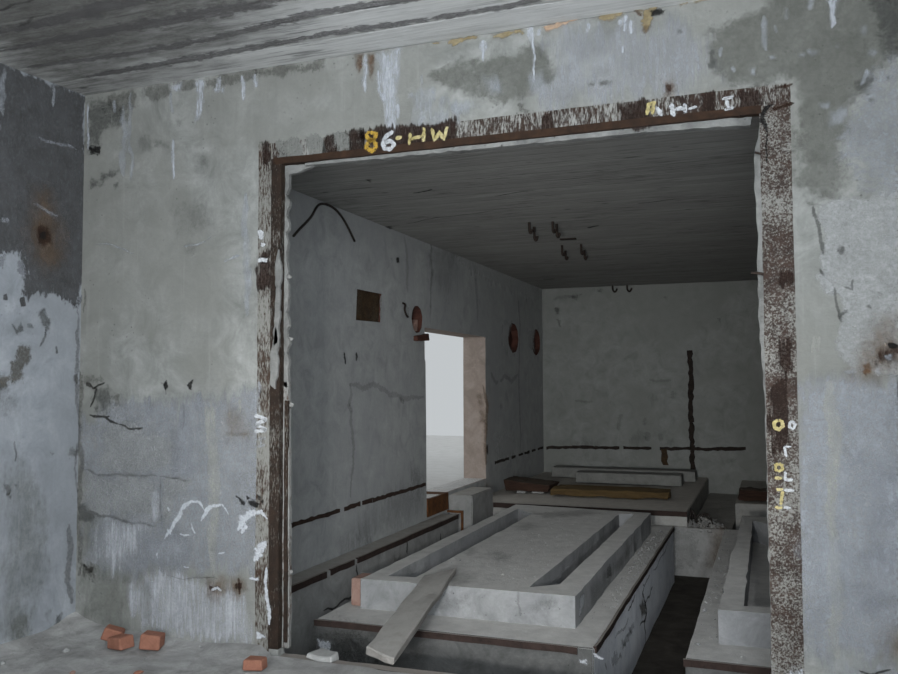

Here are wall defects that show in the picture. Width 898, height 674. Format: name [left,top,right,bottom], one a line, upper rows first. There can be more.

water stain [436,15,700,110]
water stain [362,49,400,129]
rust [347,117,457,150]
rust [617,98,652,132]
rust [701,91,715,111]
rust [738,89,760,116]
water stain [713,0,898,197]
peeling [0,63,85,308]
rust [255,248,271,291]
spalling [0,346,31,388]
crack [86,382,143,430]
rust [766,336,793,456]